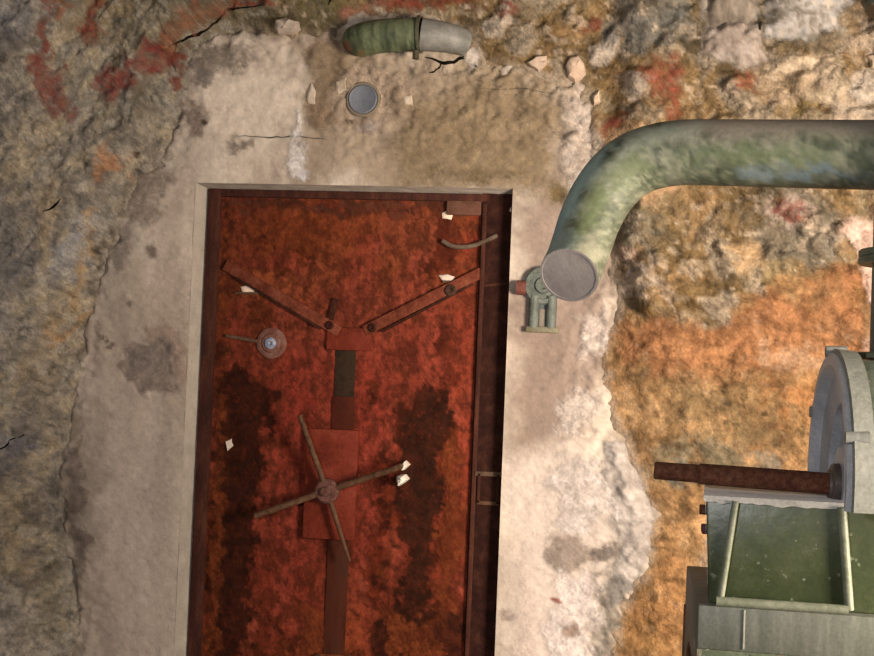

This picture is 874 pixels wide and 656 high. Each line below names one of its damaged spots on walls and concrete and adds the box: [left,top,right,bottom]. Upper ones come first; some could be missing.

corrosion [27,25,76,116]
corrosion [93,26,186,101]
crack [163,0,265,69]
damp [289,35,347,181]
crack [425,56,477,73]
corrosion [419,217,456,283]
corrosion [202,208,302,656]
corrosion [363,325,465,656]
damp [541,457,634,656]